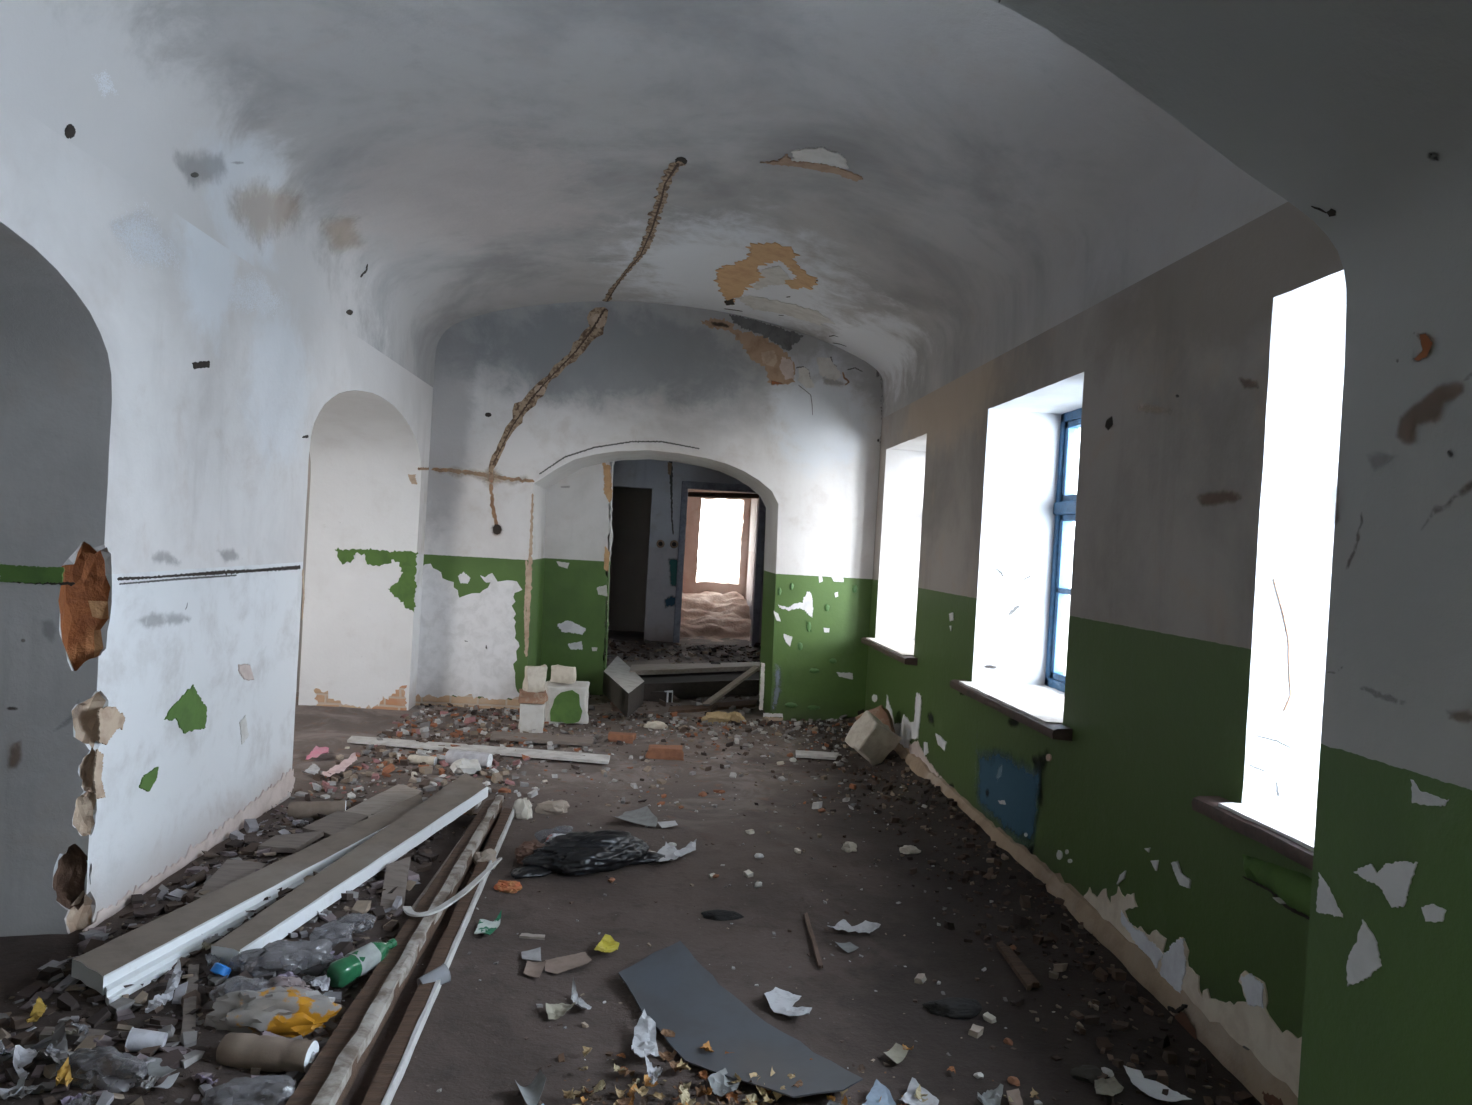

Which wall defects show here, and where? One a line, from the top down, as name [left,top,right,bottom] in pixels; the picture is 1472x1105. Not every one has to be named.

crack [418,161,700,534]
peeling [701,242,879,415]
water stain [1399,385,1461,443]
flaking render [58,542,110,671]
peeling [314,493,534,711]
peeling [557,620,598,651]
peeling [773,575,844,646]
flaking render [53,692,295,933]
peeling [1084,871,1302,1105]
peeling [1316,872,1343,918]
peeling [1346,919,1382,986]
peeling [1354,861,1446,923]